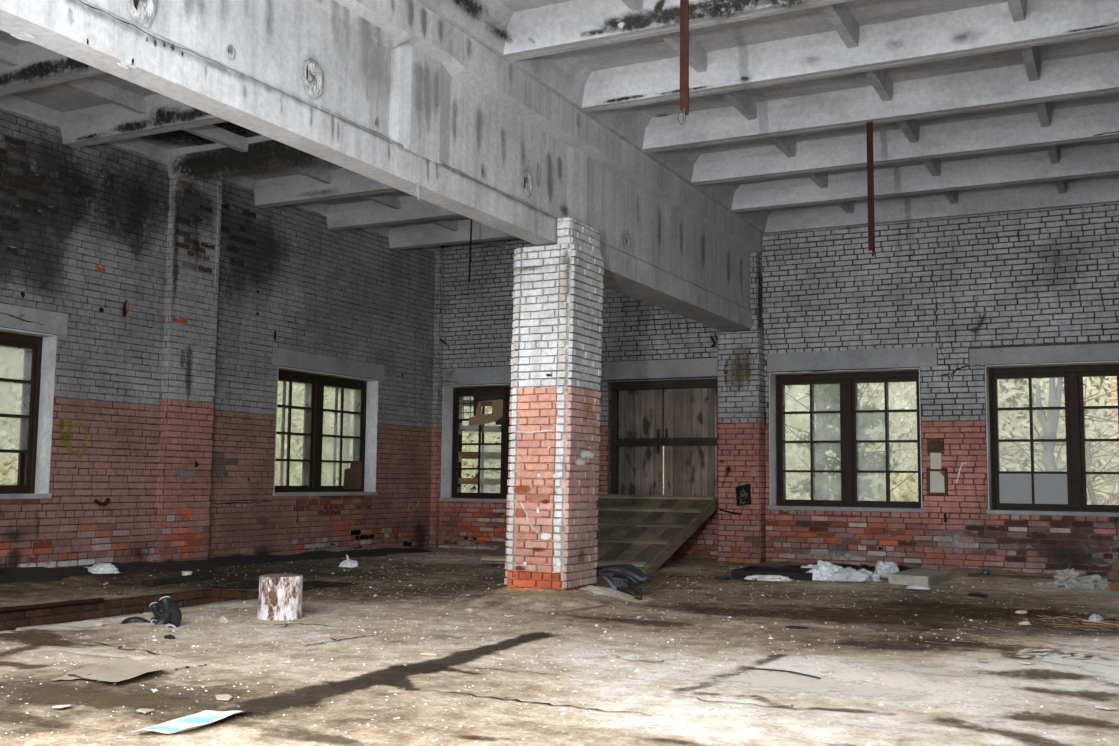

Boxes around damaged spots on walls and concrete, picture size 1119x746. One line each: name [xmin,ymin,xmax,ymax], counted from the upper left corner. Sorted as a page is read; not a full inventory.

water stain [453,0,509,42]
water stain [582,0,802,35]
water stain [0,57,92,85]
water stain [0,107,280,293]
peeling [766,510,1119,576]
crack [432,664,651,716]
crack [681,695,879,715]